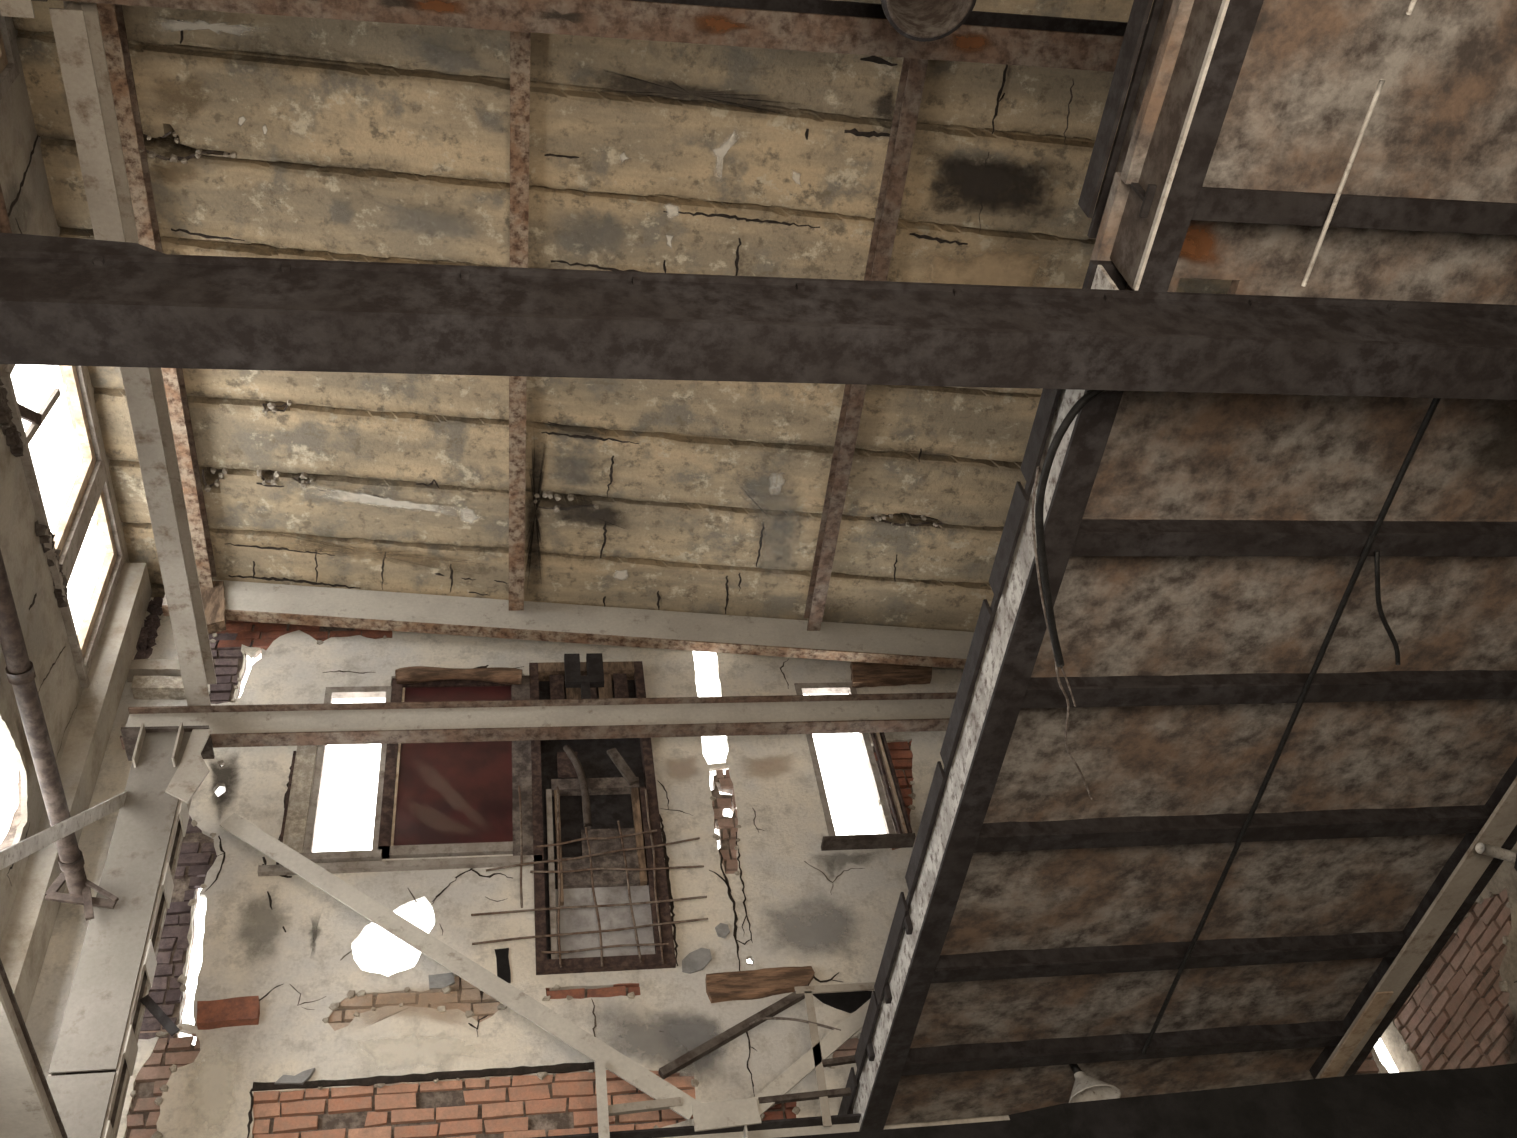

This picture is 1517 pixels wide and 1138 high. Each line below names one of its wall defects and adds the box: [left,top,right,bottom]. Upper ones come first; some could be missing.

rust [381,0,462,13]
rust [544,11,580,22]
damp [933,159,1049,215]
flaking render [209,620,393,704]
crack [709,809,765,971]
damp [775,905,852,950]
flaking render [127,815,217,1138]
flaking render [322,976,508,1031]
damp [617,1020,717,1070]
crack [746,1031,757,1096]
spalling [1009,888,1517,1138]
flaking render [252,1069,699,1138]